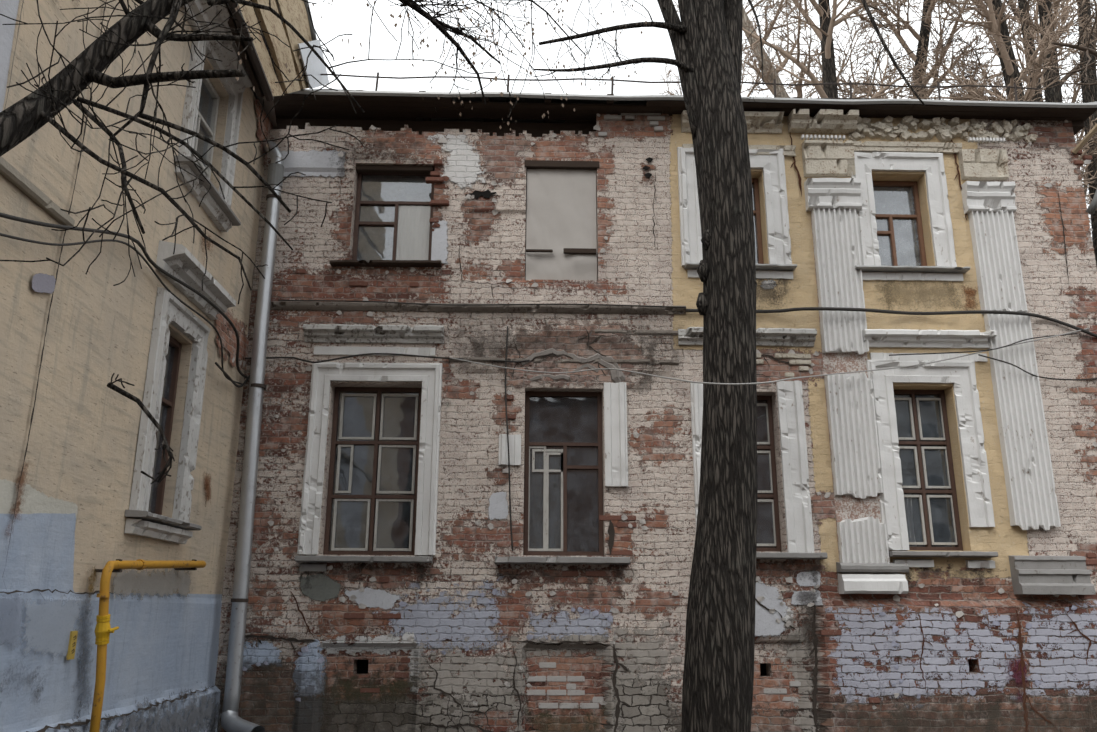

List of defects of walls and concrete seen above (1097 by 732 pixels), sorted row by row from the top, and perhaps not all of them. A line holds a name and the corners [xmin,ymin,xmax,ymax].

crack [4,0,24,110]
flaking render [268,113,673,332]
flaking render [1021,120,1094,259]
crack [0,82,122,597]
flaking render [214,309,249,371]
flaking render [1060,286,1097,496]
flaking render [251,482,306,564]
crack [26,685,215,732]
peeling [238,504,687,732]
crack [425,640,630,732]
flaking render [756,559,827,627]
peeling [807,561,1097,732]